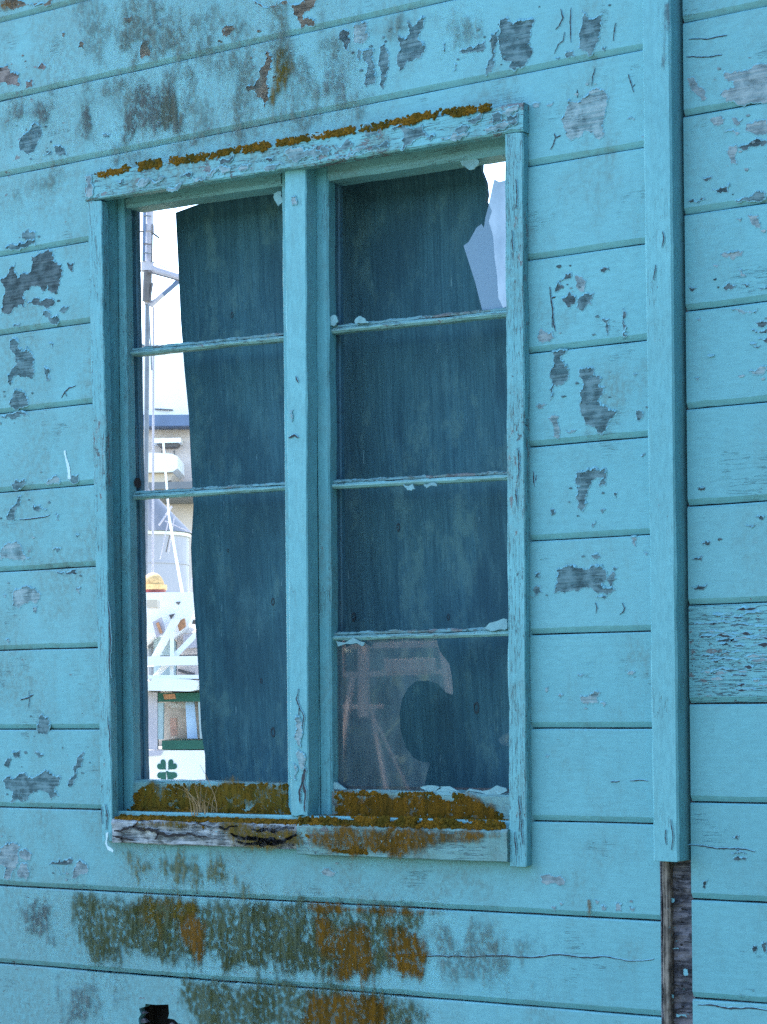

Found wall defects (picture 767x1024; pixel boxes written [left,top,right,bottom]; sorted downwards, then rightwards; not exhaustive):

peeling [337,15,427,90]
peeling [453,6,540,76]
peeling [136,104,519,192]
peeling [532,83,610,141]
peeling [710,63,767,171]
peeling [0,229,75,424]
peeling [535,328,617,439]
peeling [568,466,618,516]
peeling [532,552,618,600]
peeling [694,605,767,692]
peeling [2,750,90,803]
crack [308,953,654,962]